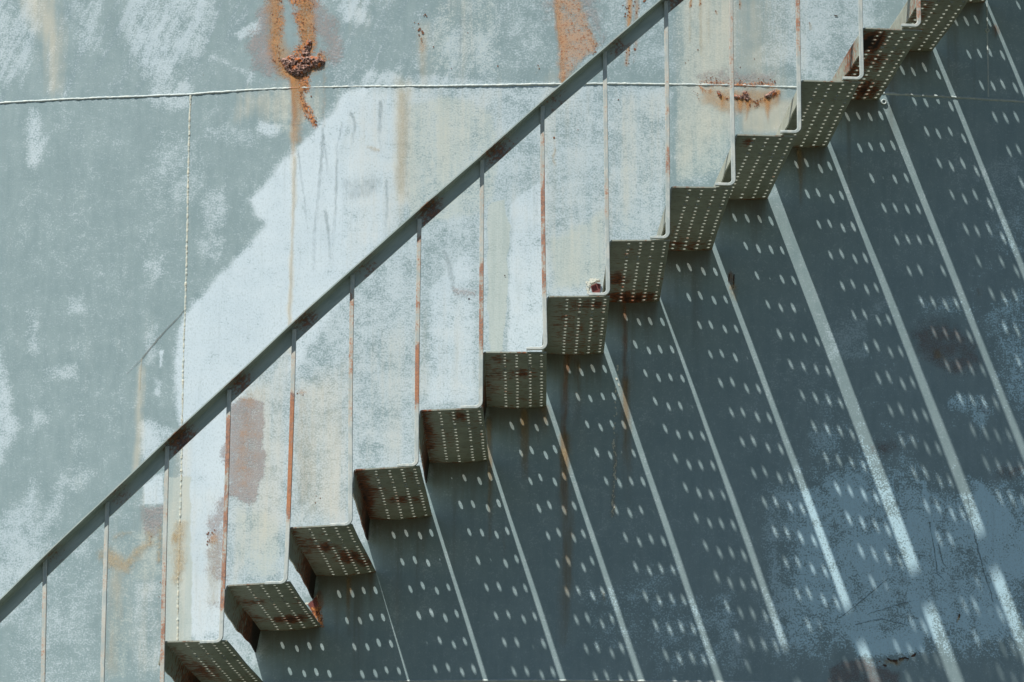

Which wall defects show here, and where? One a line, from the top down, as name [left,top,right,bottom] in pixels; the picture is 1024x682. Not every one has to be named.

corrosion [249,0,340,128]
corrosion [555,0,598,82]
corrosion [693,72,780,108]